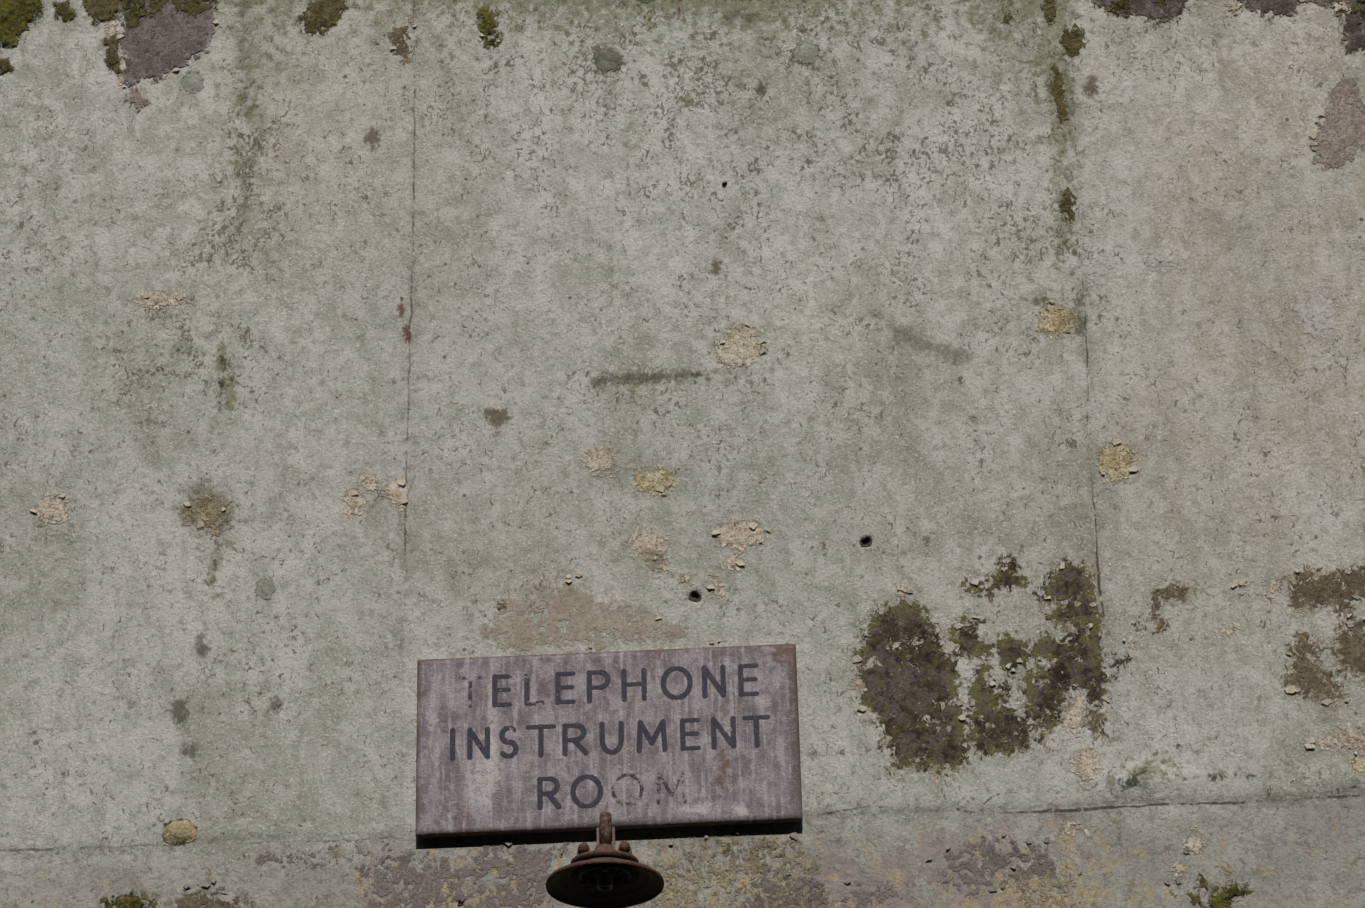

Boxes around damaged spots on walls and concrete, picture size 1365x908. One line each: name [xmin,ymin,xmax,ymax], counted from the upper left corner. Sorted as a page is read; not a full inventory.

peeling [713,318,769,371]
peeling [341,471,411,519]
peeling [624,517,772,598]
peeling [1164,825,1239,900]